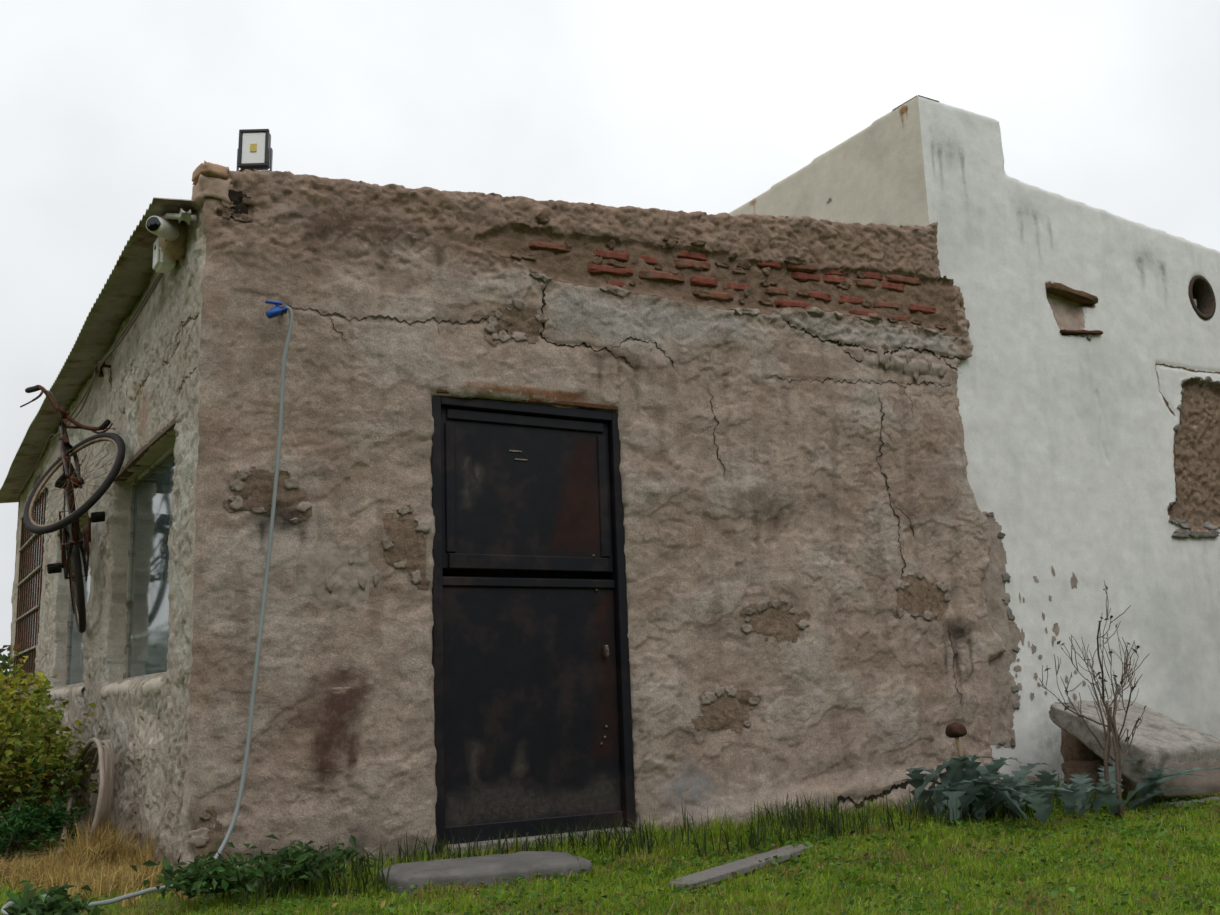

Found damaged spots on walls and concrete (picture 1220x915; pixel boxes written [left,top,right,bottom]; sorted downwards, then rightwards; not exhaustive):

spalling [476,211,961,335]
crack [135,315,199,401]
crack [271,285,675,369]
crack [703,389,726,472]
crack [765,320,965,576]
spalling [1167,376,1220,539]
peeling [981,511,1060,749]
damp [314,673,366,771]
crack [828,780,909,812]